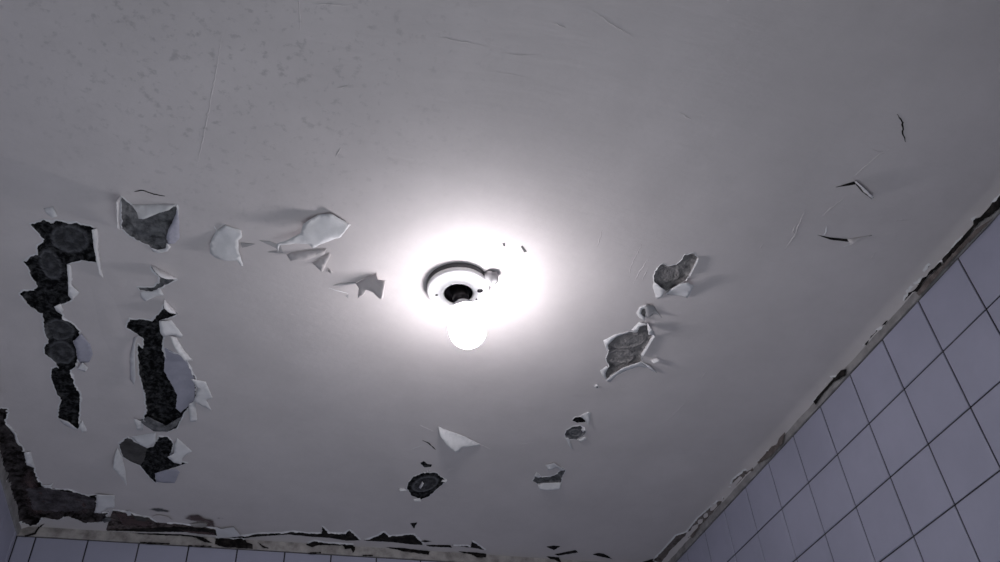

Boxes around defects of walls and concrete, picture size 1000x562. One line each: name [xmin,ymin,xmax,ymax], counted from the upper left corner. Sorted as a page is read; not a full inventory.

peeling [116,196,180,253]
peeling [209,214,351,273]
peeling [330,273,385,299]
flaking render [18,206,103,433]
peeling [594,252,699,389]
flaking render [113,265,212,485]
peeling [413,425,489,453]
peeling [564,412,591,449]
flaking render [0,407,115,537]
flaking render [399,461,448,502]
peeling [532,463,566,491]